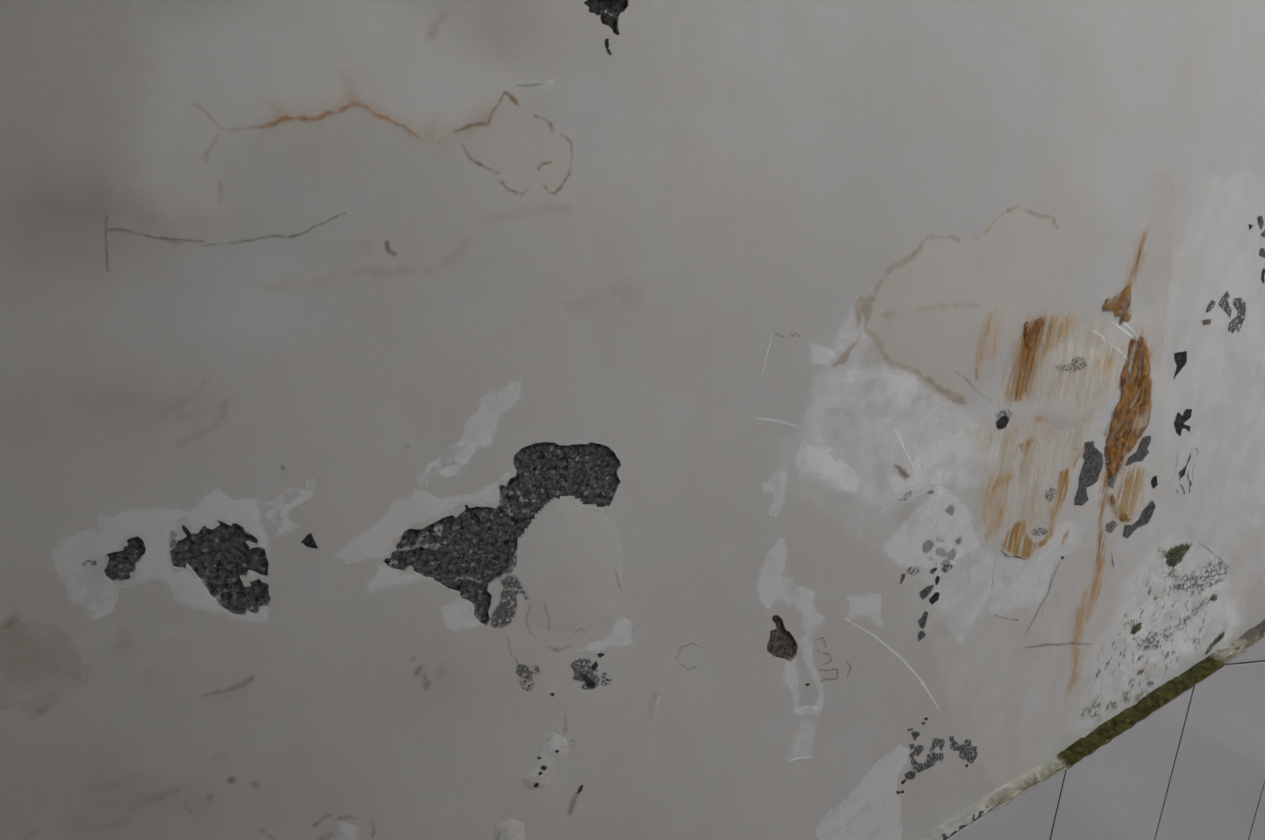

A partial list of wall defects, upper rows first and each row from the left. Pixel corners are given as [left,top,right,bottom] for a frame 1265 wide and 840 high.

spalling [584,0,627,55]
crack [270,106,411,132]
rust [1103,246,1142,325]
spalling [1174,409,1192,436]
spalling [83,536,146,581]
spalling [169,521,270,614]
spalling [384,442,619,628]
rust [988,419,1084,558]
rust [1006,318,1152,684]
spalling [1075,436,1151,506]
spalling [767,615,796,660]
peeling [895,717,978,794]